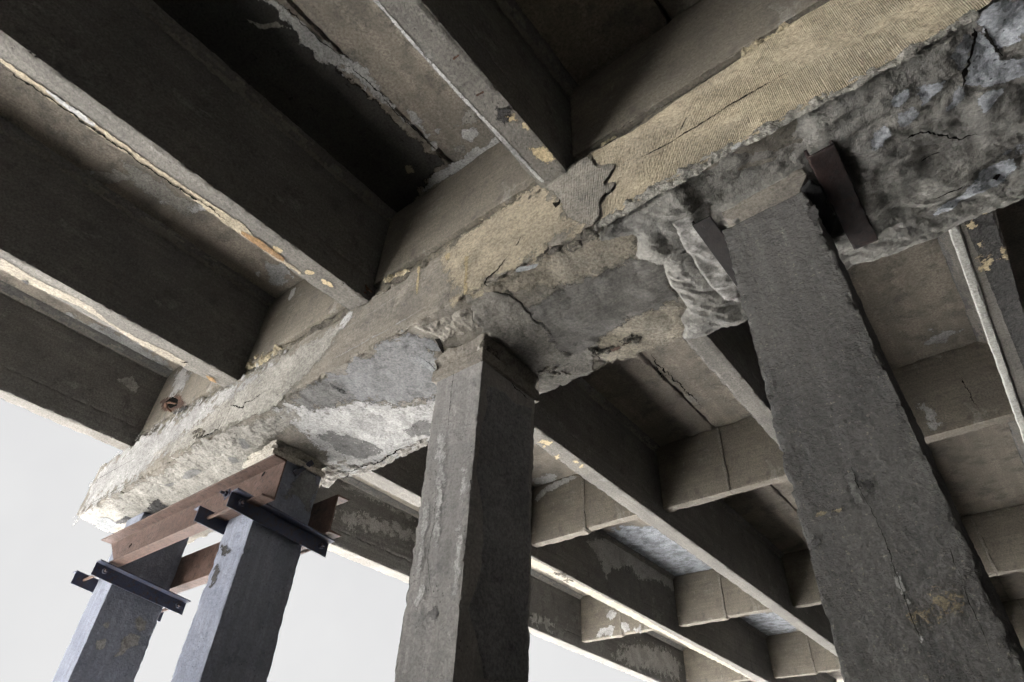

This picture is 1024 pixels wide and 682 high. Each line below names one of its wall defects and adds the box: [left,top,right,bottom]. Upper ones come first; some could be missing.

crack [961,27,1003,88]
peeling [0,59,253,242]
peeling [373,0,1024,255]
crack [907,131,981,162]
peeling [0,258,188,367]
peeling [965,211,1024,369]
rust [159,367,192,414]
spalling [414,338,444,373]
crack [651,354,700,405]
peeling [80,311,353,532]
spalling [322,438,428,488]